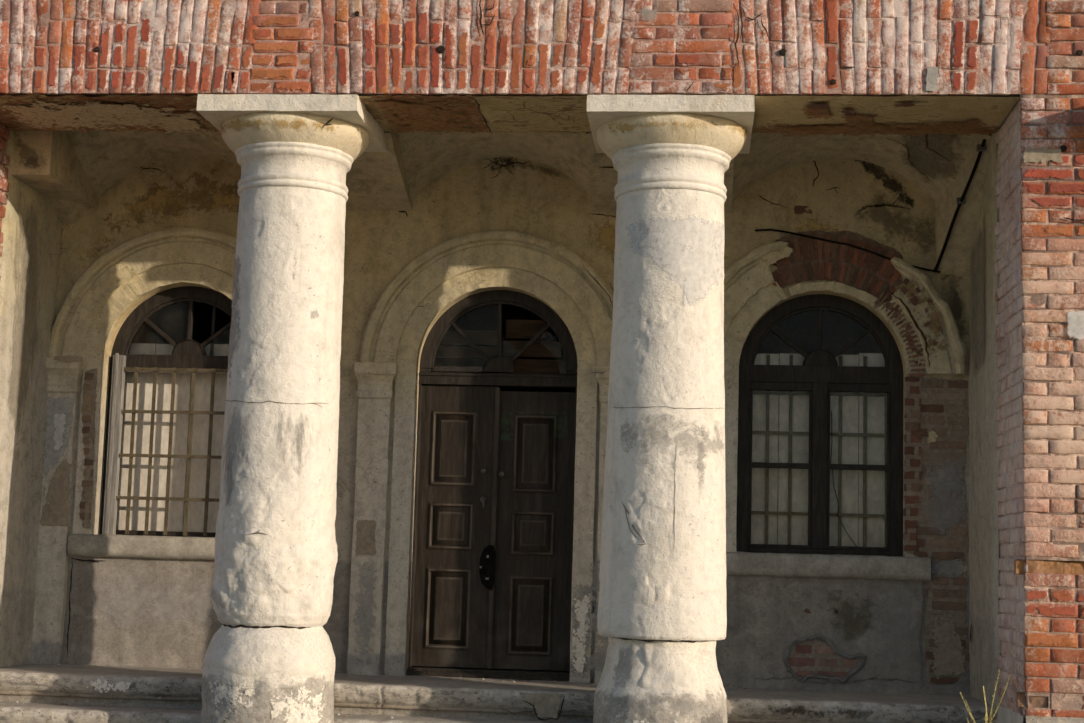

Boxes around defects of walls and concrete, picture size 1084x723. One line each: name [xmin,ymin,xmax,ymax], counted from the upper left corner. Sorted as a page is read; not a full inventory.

damp [87,172,240,257]
crack [858,201,910,212]
peeling [626,215,724,306]
damp [228,259,240,377]
spalling [770,230,970,685]
peeling [572,594,591,676]
peeling [208,680,256,713]
peeling [270,685,323,723]